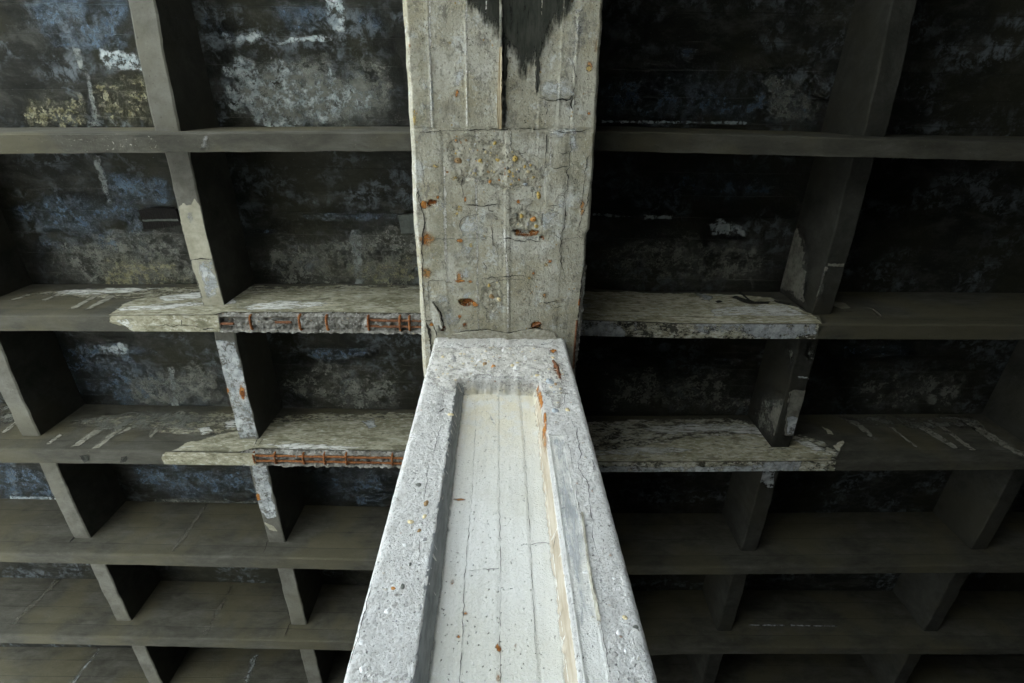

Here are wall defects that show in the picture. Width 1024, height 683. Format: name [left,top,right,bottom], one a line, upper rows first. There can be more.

efflorescence [224,57,392,127]
damp [467,0,574,127]
crack [416,62,590,356]
spalling [217,265,587,413]
spalling [241,448,405,469]
corrosion [536,386,547,447]